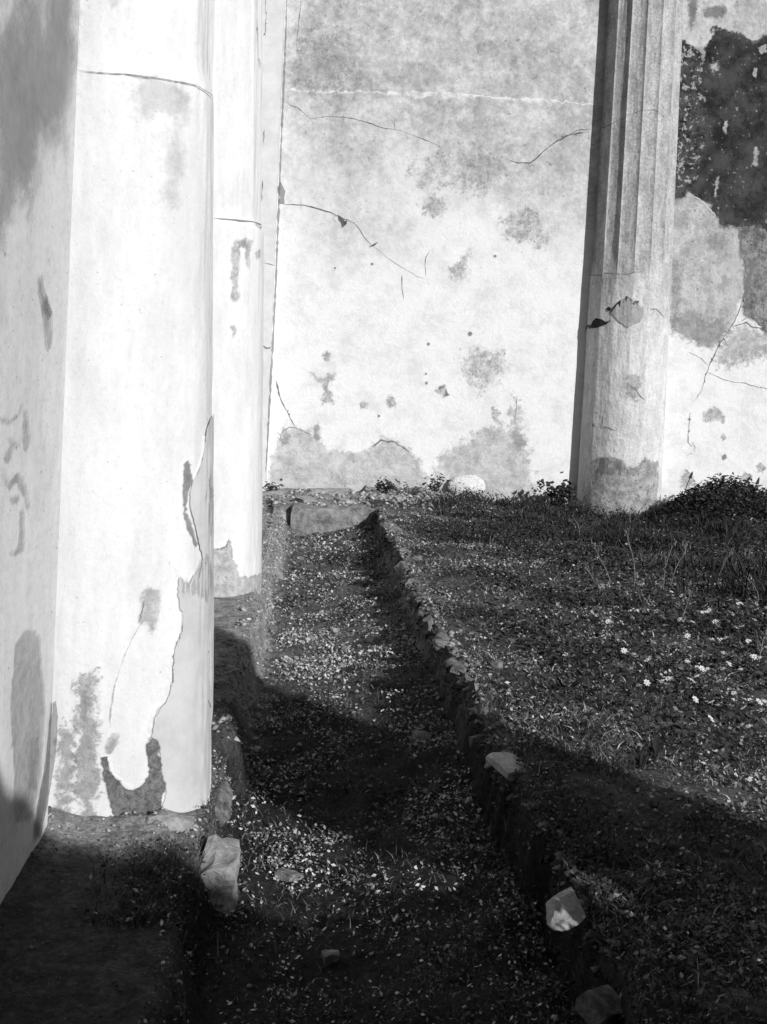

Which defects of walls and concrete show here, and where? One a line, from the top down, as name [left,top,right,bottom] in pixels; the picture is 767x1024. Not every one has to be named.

water stain [0,0,74,225]
crack [81,70,212,95]
crack [217,0,440,467]
crack [507,110,664,166]
spalling [586,296,643,329]
peeling [670,25,767,347]
crack [685,297,767,482]
water stain [716,323,767,365]
peeling [13,415,262,839]